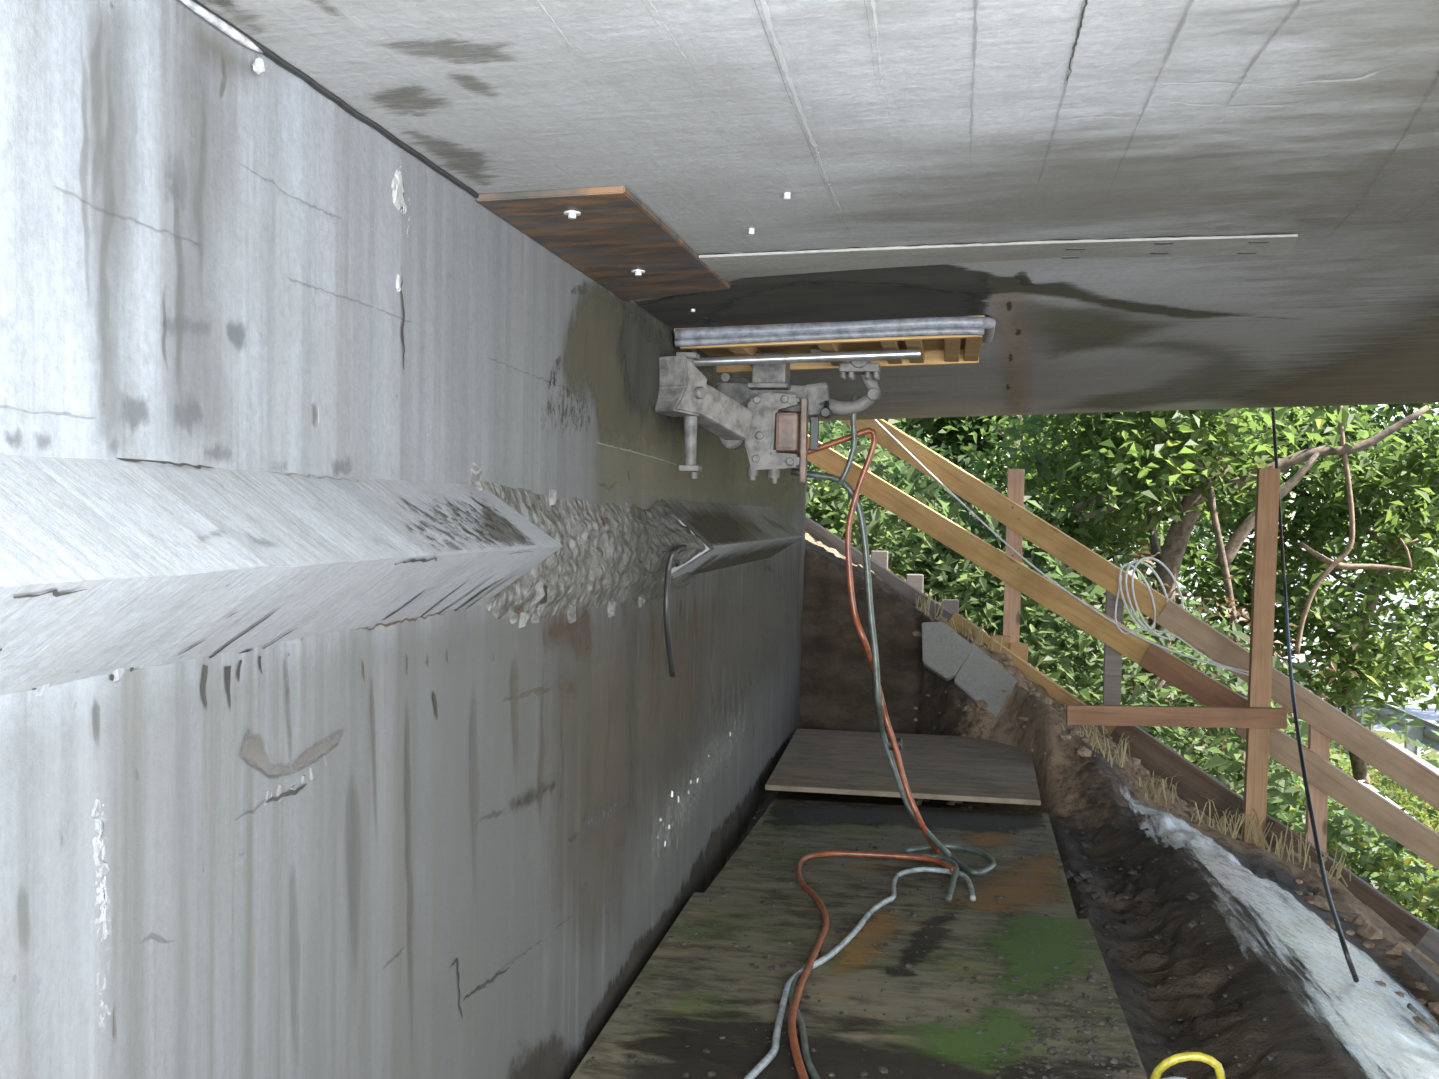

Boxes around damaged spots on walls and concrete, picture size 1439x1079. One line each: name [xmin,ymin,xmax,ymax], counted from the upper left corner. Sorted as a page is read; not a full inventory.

crack [1067,0,1087,80]
crack [391,169,408,214]
damp [228,325,244,346]
crack [396,274,405,368]
damp [127,399,145,426]
damp [541,264,1244,576]
damp [402,498,529,551]
spalling [470,462,714,677]
spalling [241,731,342,806]
peeling [91,798,110,904]
crack [451,958,509,1018]